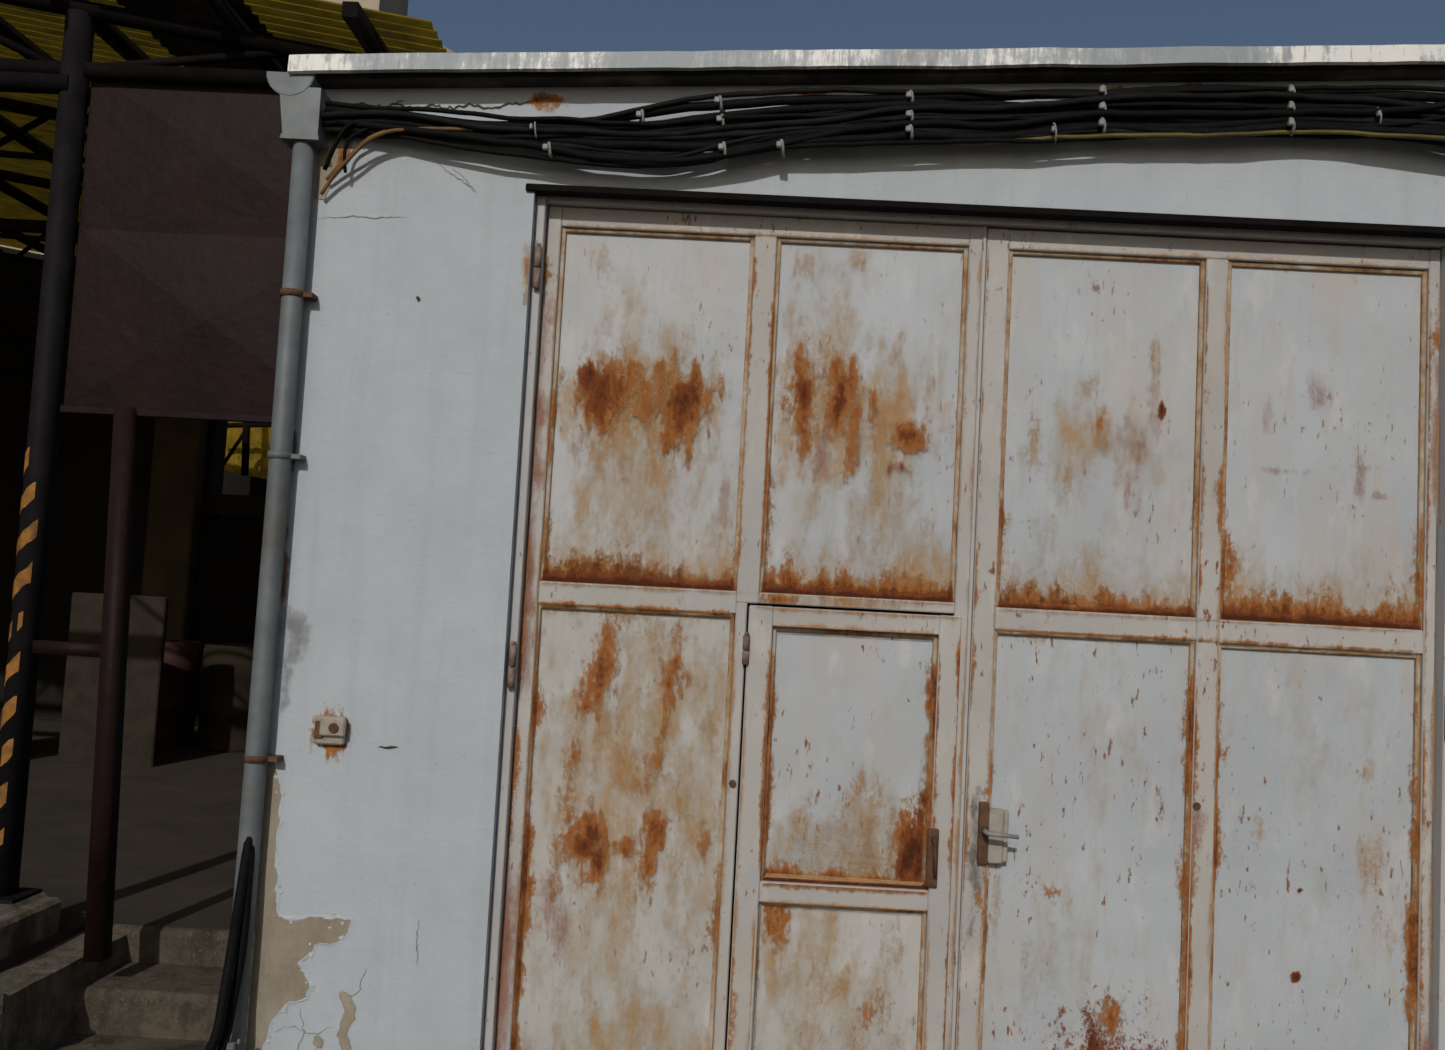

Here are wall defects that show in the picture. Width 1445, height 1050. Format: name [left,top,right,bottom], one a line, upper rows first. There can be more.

rust [528,92,563,110]
rust [747,257,757,379]
rust [616,226,912,242]
rust [495,286,997,1050]
rust [994,290,1441,1050]
flaking render [246,749,356,1050]